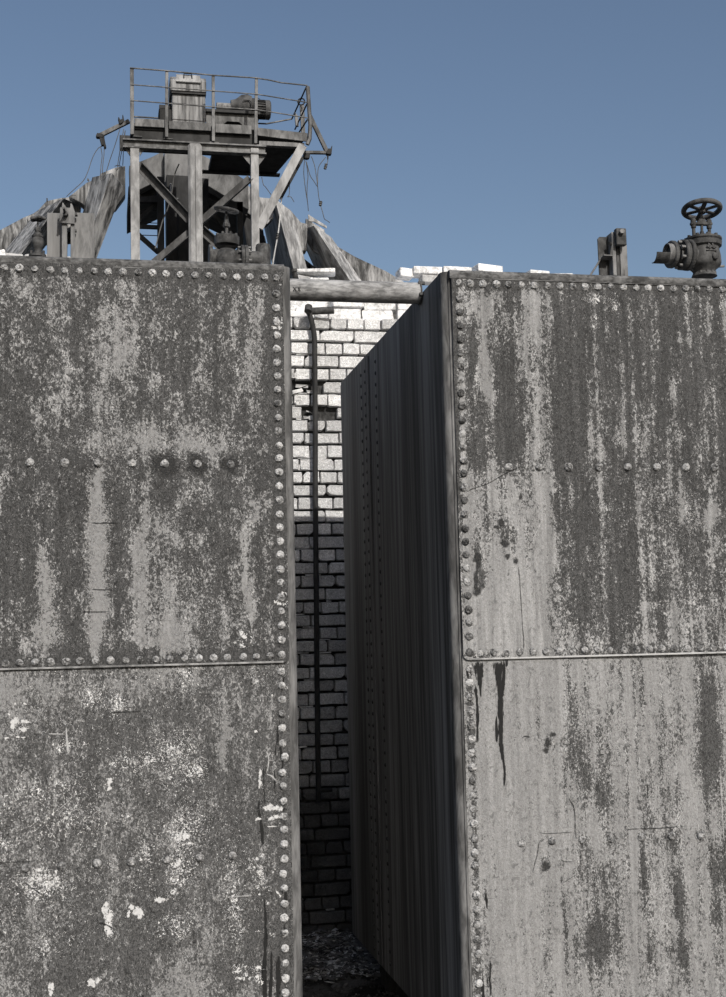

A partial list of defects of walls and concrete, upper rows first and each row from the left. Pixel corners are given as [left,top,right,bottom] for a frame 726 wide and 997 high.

spalling [292,382,312,395]
spalling [301,409,313,421]
rust [151,454,206,475]
rust [220,458,240,473]
rust [473,553,482,596]